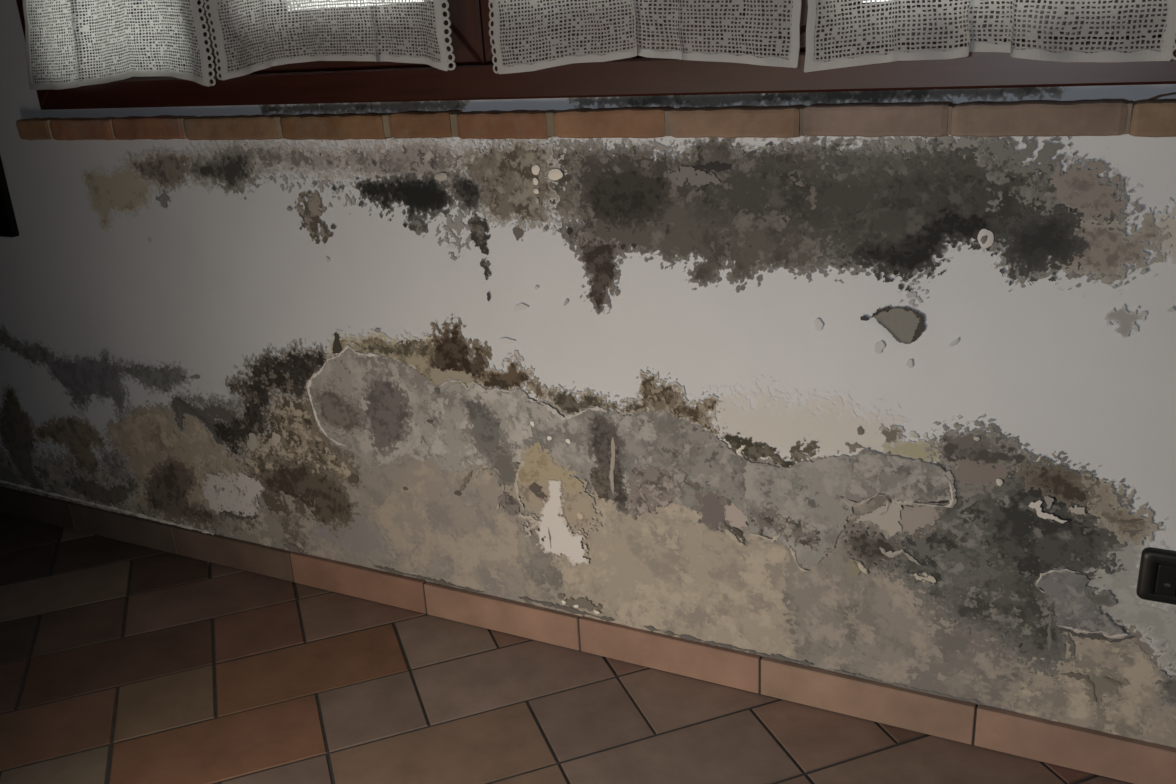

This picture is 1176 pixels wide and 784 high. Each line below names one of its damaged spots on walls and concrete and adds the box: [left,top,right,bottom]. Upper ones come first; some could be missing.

damp [77,135,1176,315]
spalling [873,307,920,344]
damp [1104,304,1147,338]
damp [557,594,603,615]
flaking render [0,348,1176,748]
damp [838,414,1176,707]